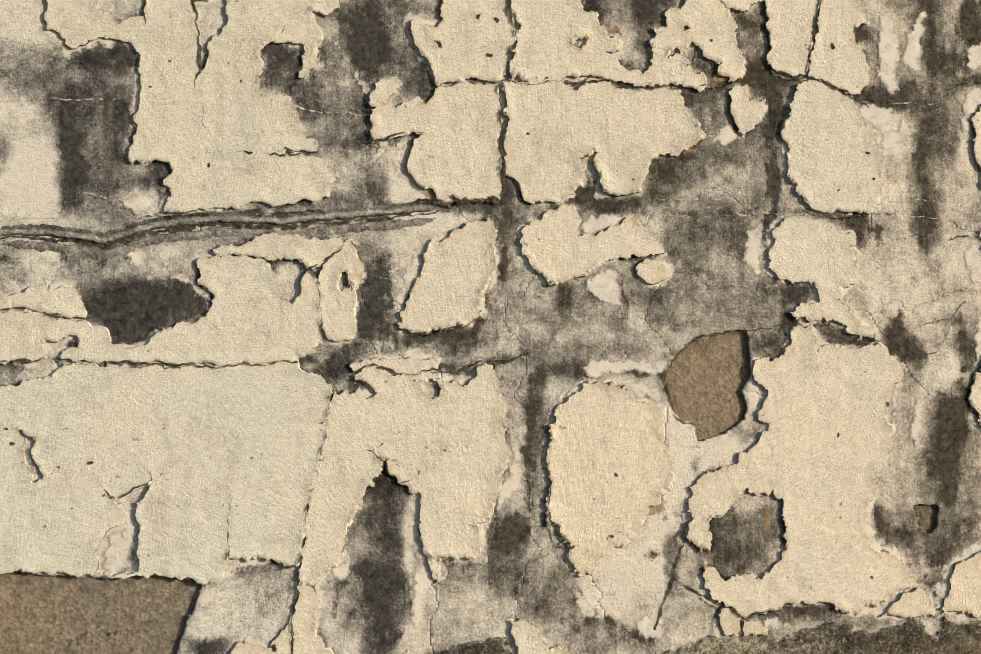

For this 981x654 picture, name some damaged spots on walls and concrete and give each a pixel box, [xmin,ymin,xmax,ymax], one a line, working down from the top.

leakage [260,42,327,118]
crack [0,0,744,335]
leakage [552,153,701,219]
leakage [663,12,790,255]
crack [778,0,901,108]
peeling [0,335,177,386]
peeling [0,230,256,348]
peeling [570,0,981,654]
peeling [3,428,43,482]
leakage [488,347,581,600]
leakage [872,315,980,599]
spalling [0,486,306,654]